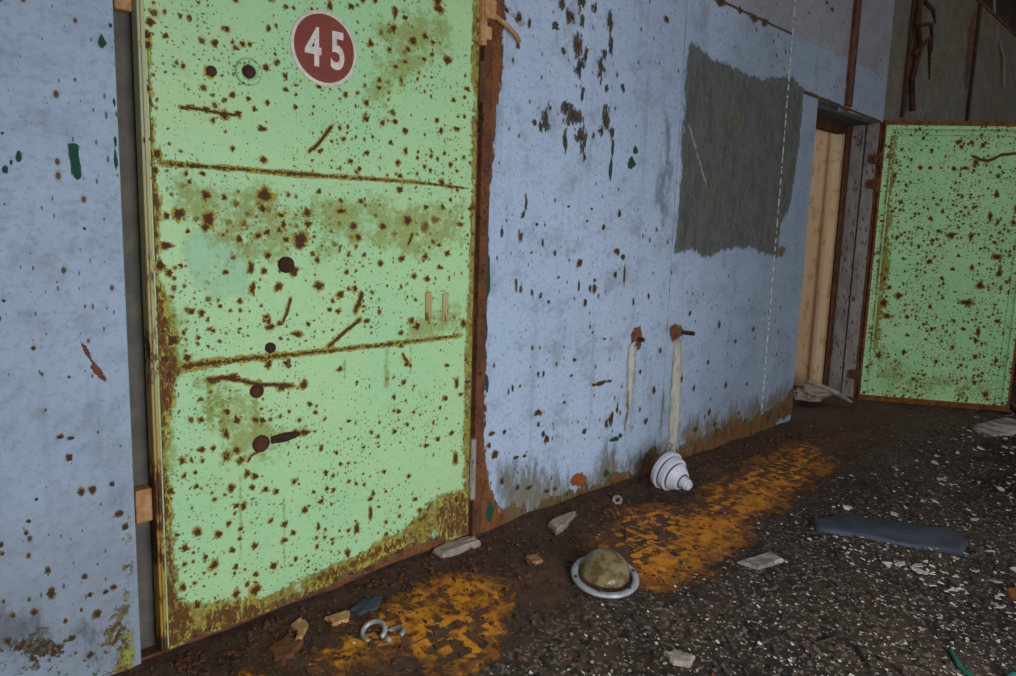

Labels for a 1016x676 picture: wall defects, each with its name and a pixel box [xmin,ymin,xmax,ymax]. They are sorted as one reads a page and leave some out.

peeling [674,43,804,259]
corrosion [856,120,1016,412]
corrosion [81,343,106,382]
leakage [585,323,736,489]
corrosion [77,485,97,497]
corrosion [114,510,131,539]
leakage [502,468,569,518]
corrosion [0,564,135,676]